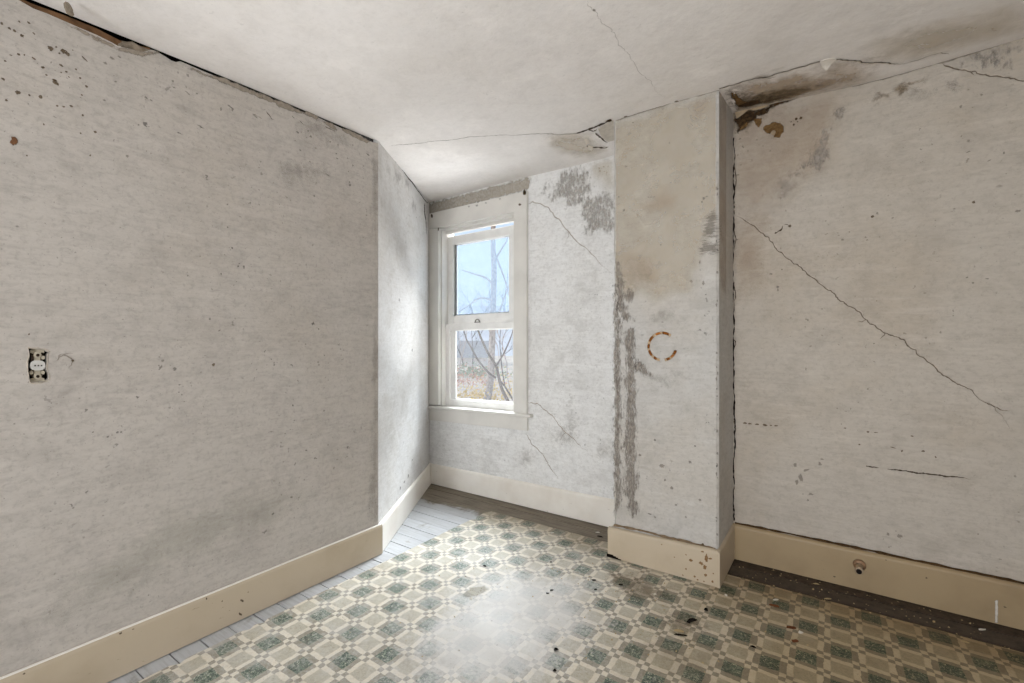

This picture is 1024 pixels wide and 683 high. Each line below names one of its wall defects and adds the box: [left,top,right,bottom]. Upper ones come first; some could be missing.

flaking render [731,93,793,138]
leakage [748,70,855,103]
crack [587,4,1024,121]
crack [529,201,606,268]
crack [733,138,1024,584]
crack [530,402,582,448]